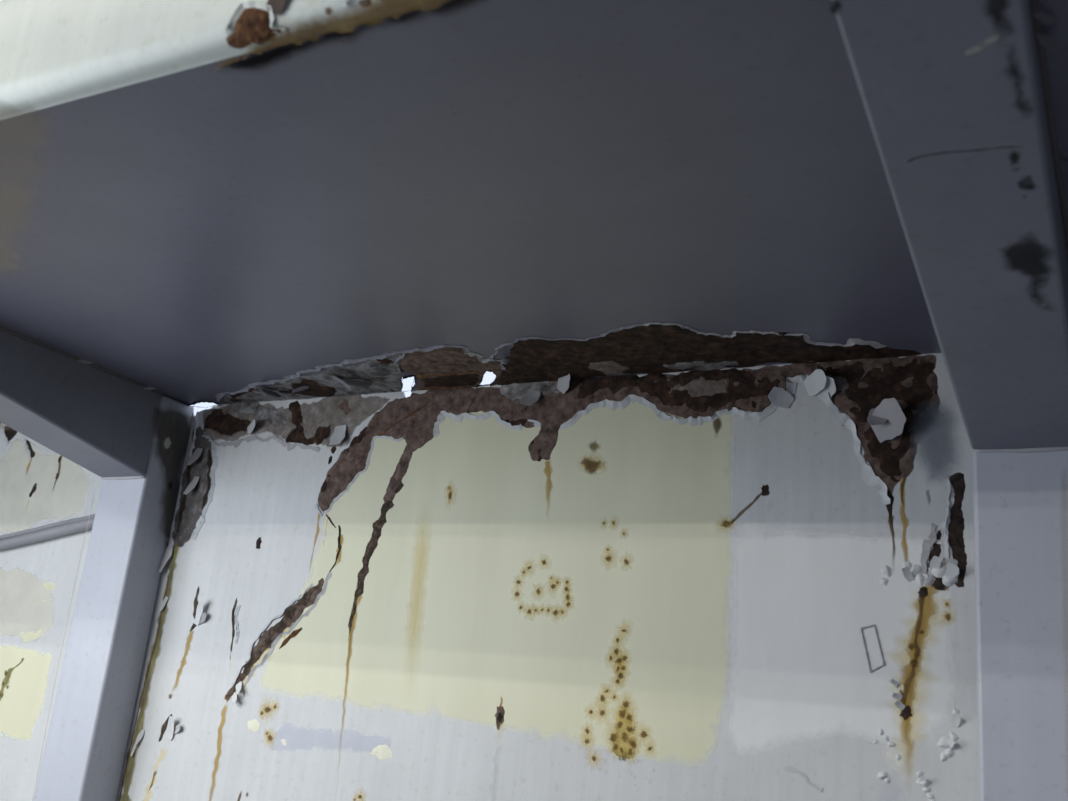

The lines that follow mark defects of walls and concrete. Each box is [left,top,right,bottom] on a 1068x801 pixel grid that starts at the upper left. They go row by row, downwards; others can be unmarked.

rust [218,0,450,68]
crack [157,412,218,572]
peeling [202,351,402,464]
rust [311,322,940,733]
peeling [880,556,959,590]
peeling [913,405,956,503]
crack [0,658,24,700]
crack [144,586,206,801]
crack [209,514,343,801]
rust [583,626,653,764]
rust [890,585,953,761]